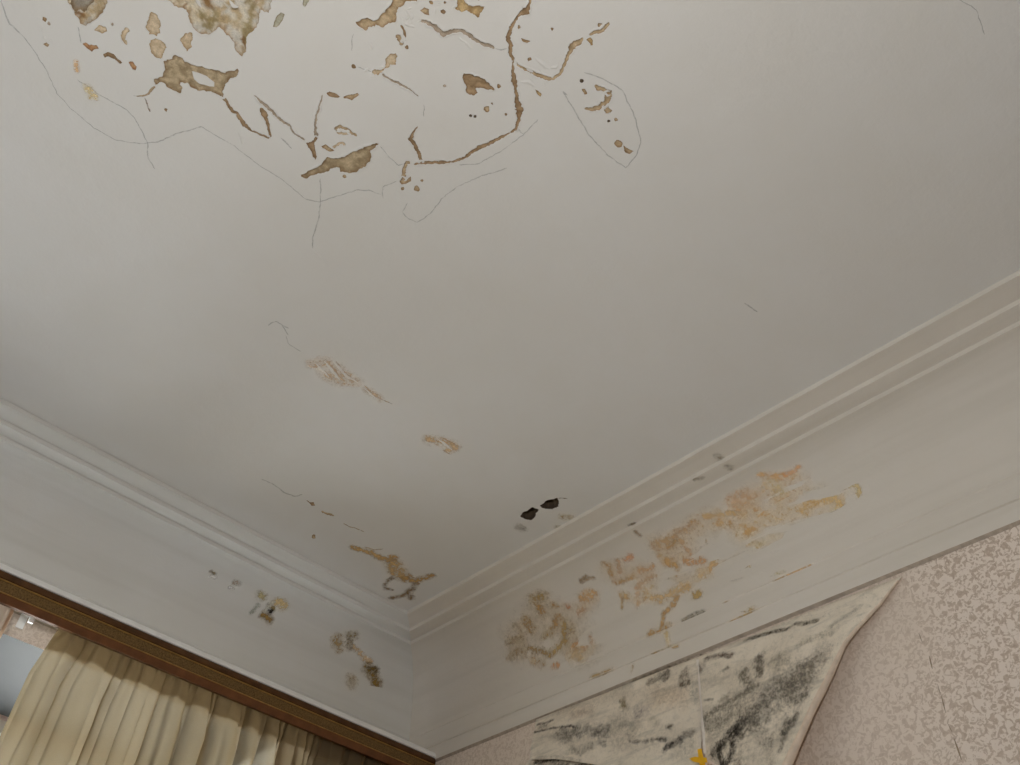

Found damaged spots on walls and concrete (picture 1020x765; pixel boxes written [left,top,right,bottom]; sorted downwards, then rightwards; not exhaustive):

flaking render [65,0,138,71]
flaking render [136,0,286,99]
crack [220,95,324,161]
flaking render [300,122,380,181]
crack [351,52,419,97]
flaking render [354,0,486,50]
peeling [461,72,502,118]
crack [398,0,611,193]
peeling [579,78,619,123]
damp [604,521,715,637]
damp [333,633,382,687]
damp [705,656,802,765]